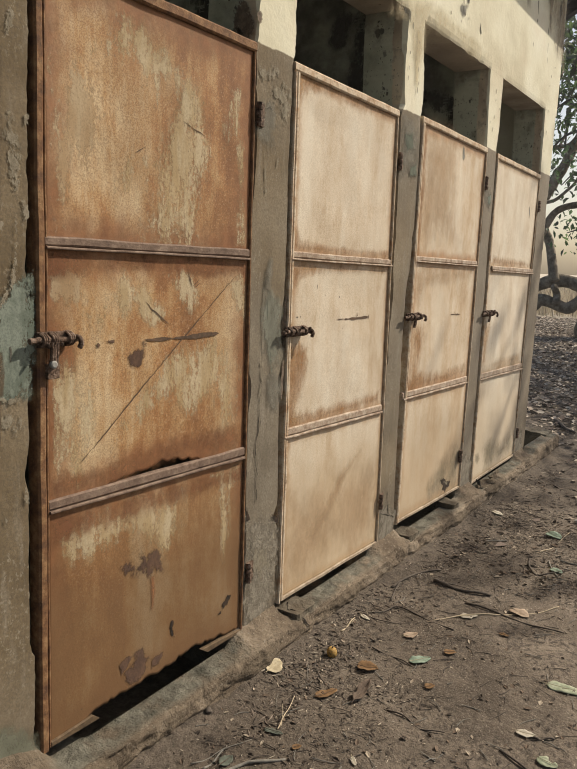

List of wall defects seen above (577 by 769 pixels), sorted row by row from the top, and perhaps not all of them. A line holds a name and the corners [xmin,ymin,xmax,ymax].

water stain [190,0,209,20]
peeling [0,110,37,437]
corrosion [128,341,146,367]
crack [254,380,262,499]
corrosion [122,549,163,606]